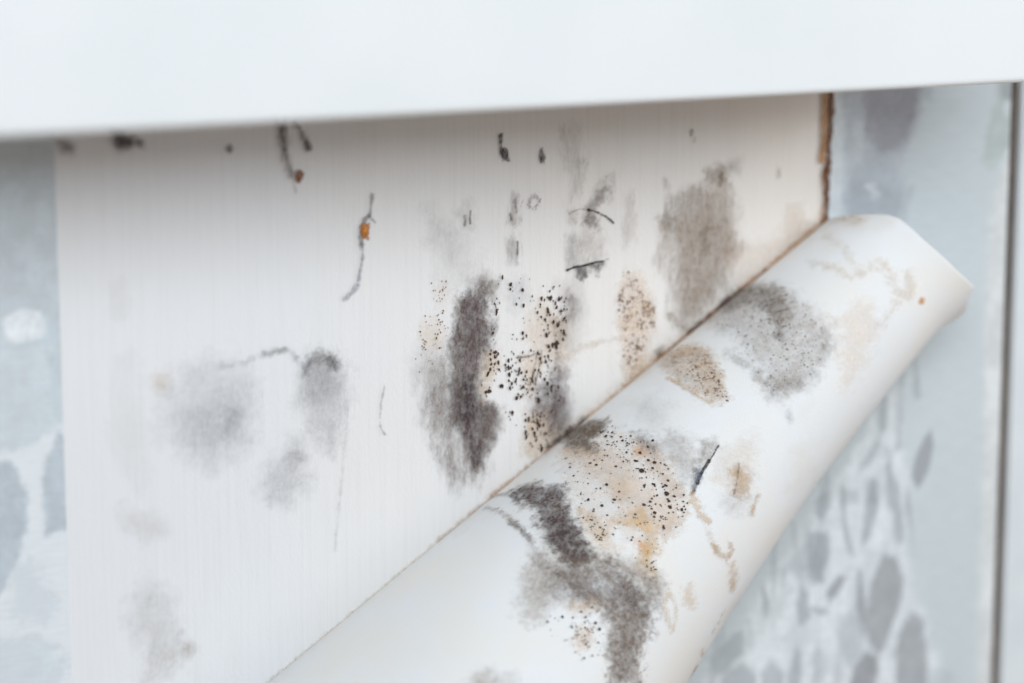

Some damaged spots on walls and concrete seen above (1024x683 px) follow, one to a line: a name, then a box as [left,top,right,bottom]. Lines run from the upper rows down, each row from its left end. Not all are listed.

corrosion [360,223,370,240]
damp [659,347,729,401]
damp [662,189,824,390]
damp [415,271,697,682]